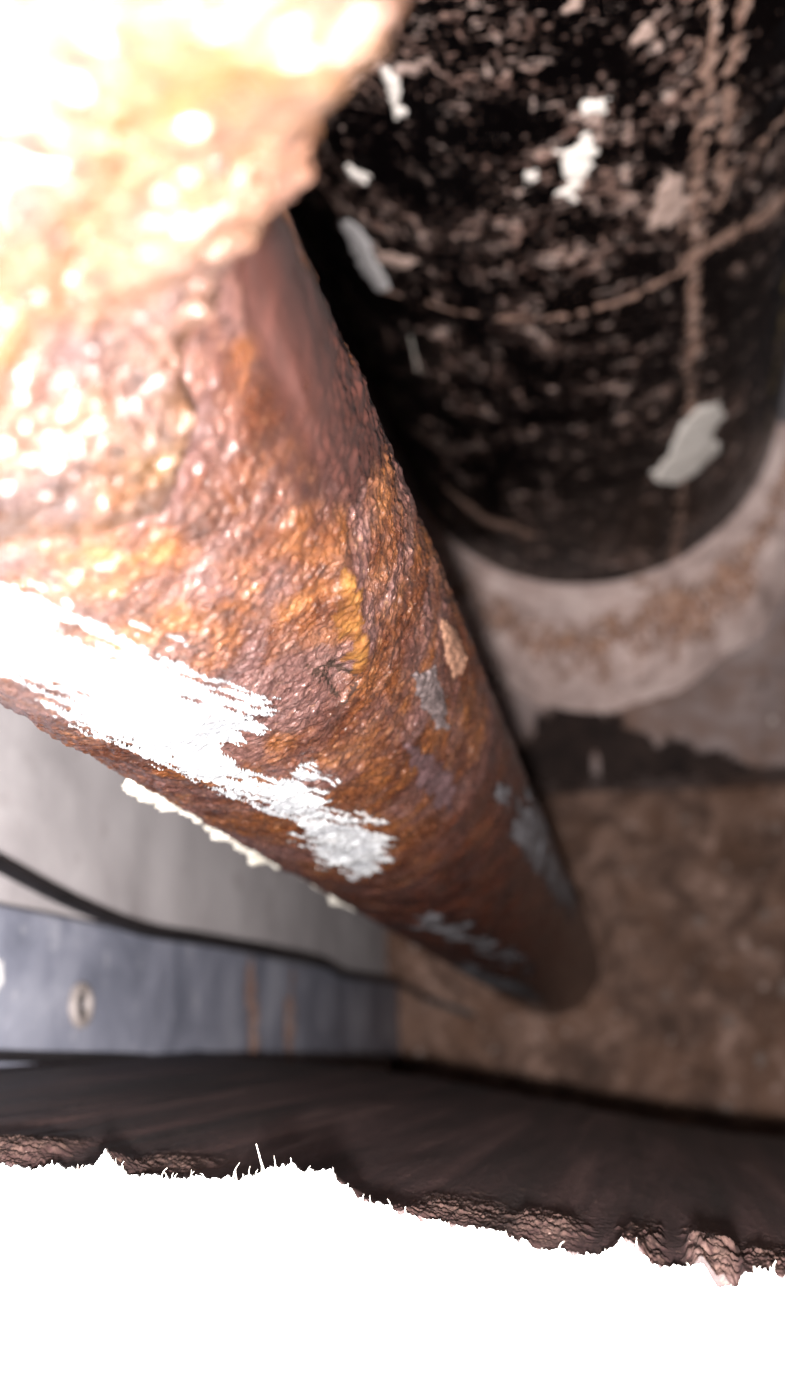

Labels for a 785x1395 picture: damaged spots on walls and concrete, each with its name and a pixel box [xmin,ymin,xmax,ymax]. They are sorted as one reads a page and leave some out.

spalling [630,22,656,51]
spalling [380,67,407,120]
spalling [581,98,611,115]
spalling [345,164,371,184]
spalling [553,132,599,203]
spalling [647,171,691,231]
spalling [341,220,419,292]
rust [237,214,385,503]
spalling [650,402,726,485]
rust [333,567,370,674]
peeling [0,577,398,882]
rust [403,742,456,812]